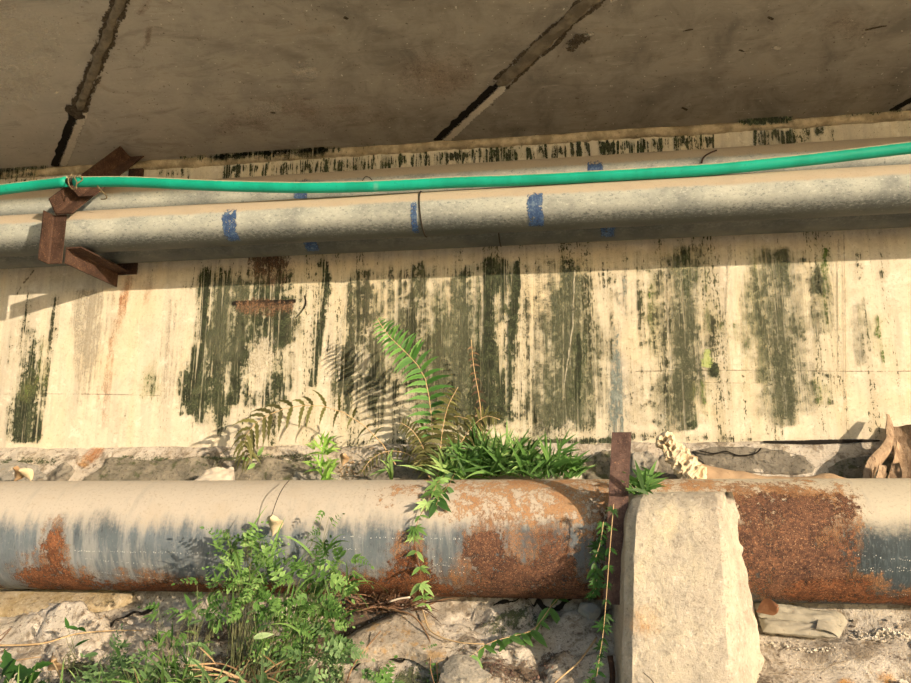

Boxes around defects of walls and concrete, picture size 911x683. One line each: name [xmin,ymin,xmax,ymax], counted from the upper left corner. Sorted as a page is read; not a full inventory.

leakage [739,116,796,146]
leakage [0,165,48,183]
leakage [159,134,714,179]
corrosion [248,256,289,286]
leakage [177,239,885,446]
leakage [6,294,58,443]